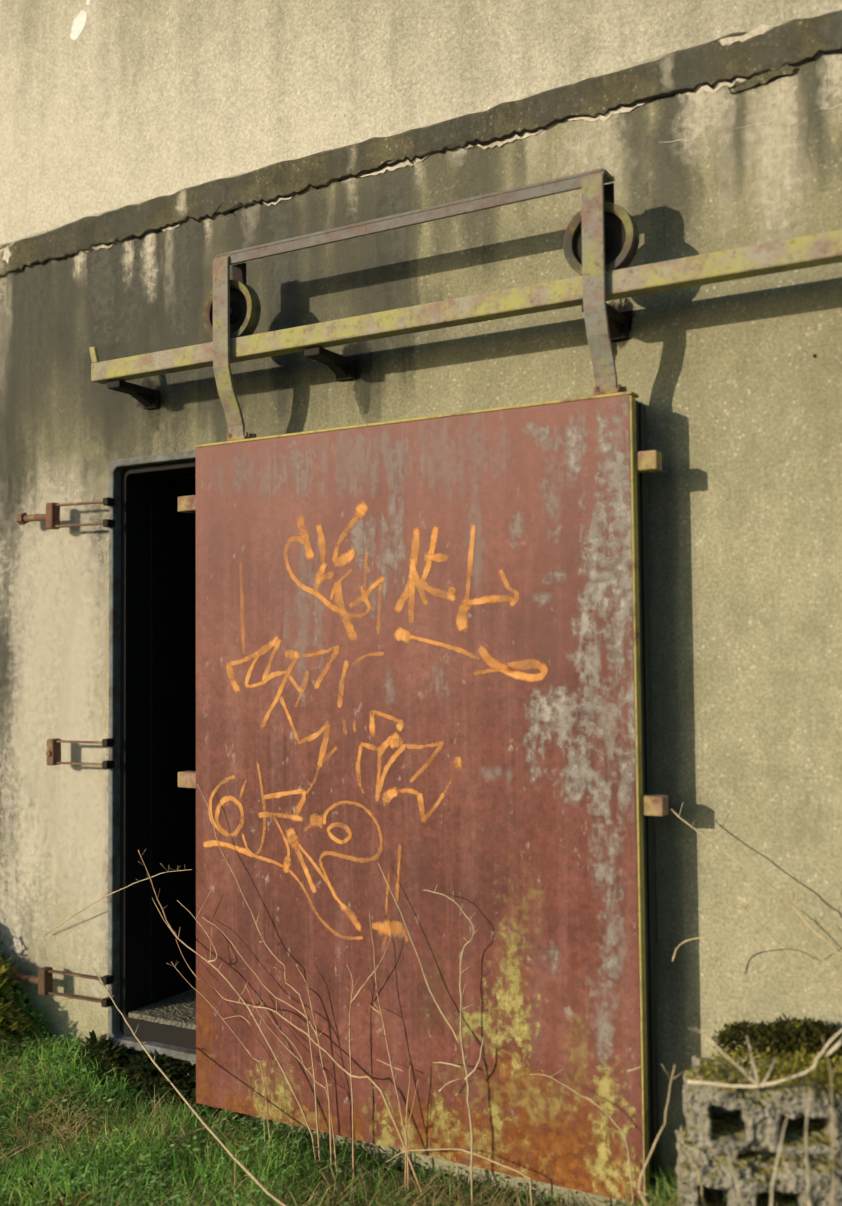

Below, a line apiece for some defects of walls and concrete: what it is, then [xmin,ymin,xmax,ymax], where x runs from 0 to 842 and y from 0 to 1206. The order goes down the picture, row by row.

damp [337,158,419,313]
crack [0,48,842,286]
damp [571,44,728,219]
damp [750,10,842,229]
damp [0,192,328,996]
peeling [524,412,635,884]
corrosion [224,1097,336,1132]
corrosion [404,1053,638,1200]